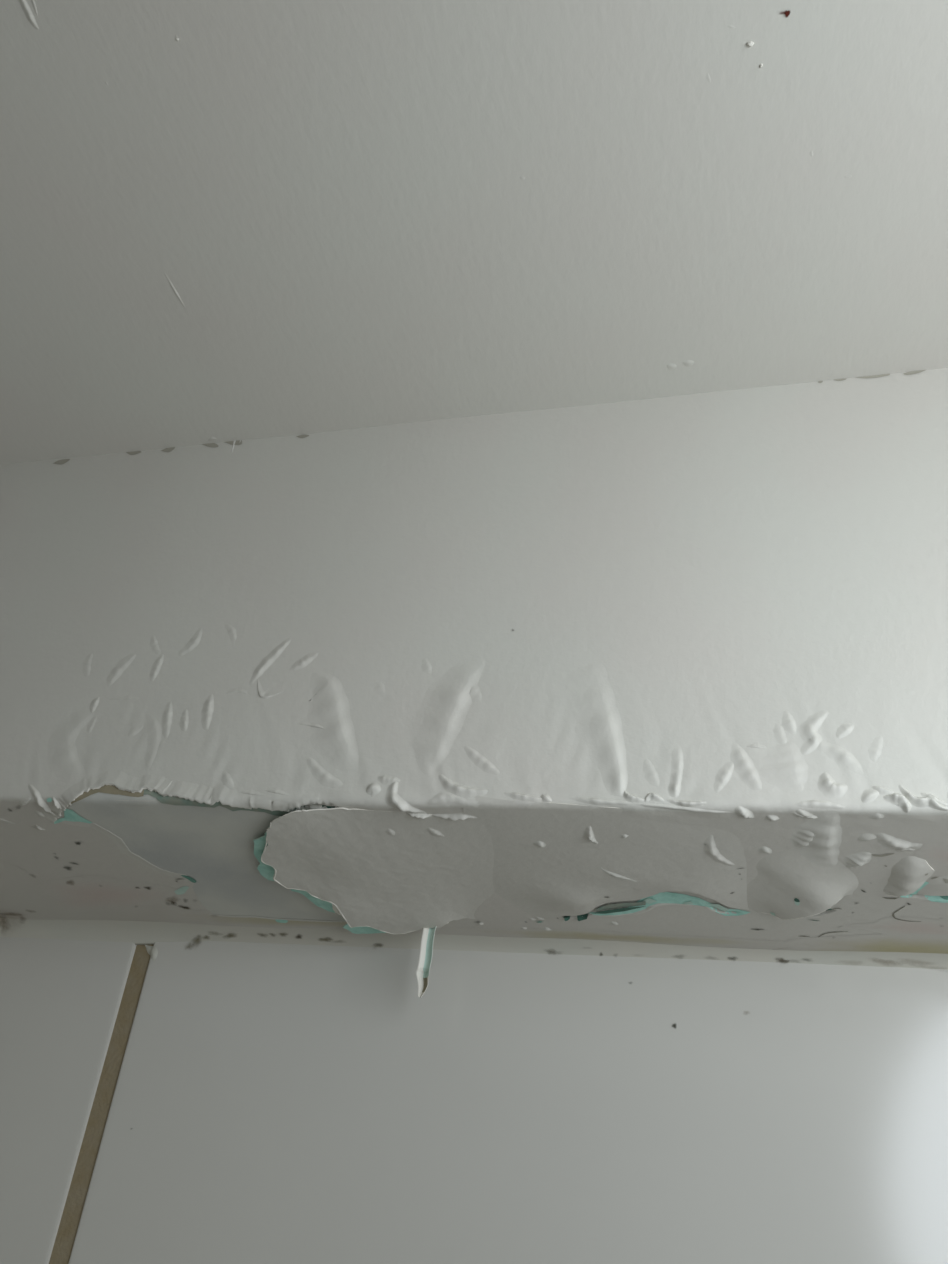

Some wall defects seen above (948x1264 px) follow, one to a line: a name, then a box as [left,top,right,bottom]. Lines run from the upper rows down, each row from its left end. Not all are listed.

peeling [41,770,346,923]
peeling [747,809,948,920]
damp [416,903,948,962]